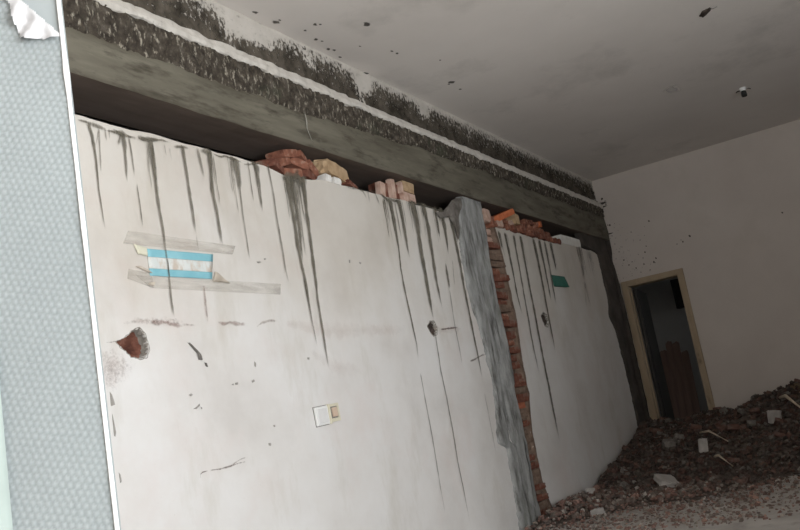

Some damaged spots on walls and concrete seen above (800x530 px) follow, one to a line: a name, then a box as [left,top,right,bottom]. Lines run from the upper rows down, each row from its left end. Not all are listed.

leakage [80,120,166,242]
spalling [115,327,150,360]
leakage [176,145,195,225]
leakage [198,149,286,268]
leakage [283,171,327,354]
leakage [121,0,596,201]
leakage [377,194,481,370]
spalling [427,320,438,337]
spalling [485,216,562,515]
leakage [498,232,557,427]